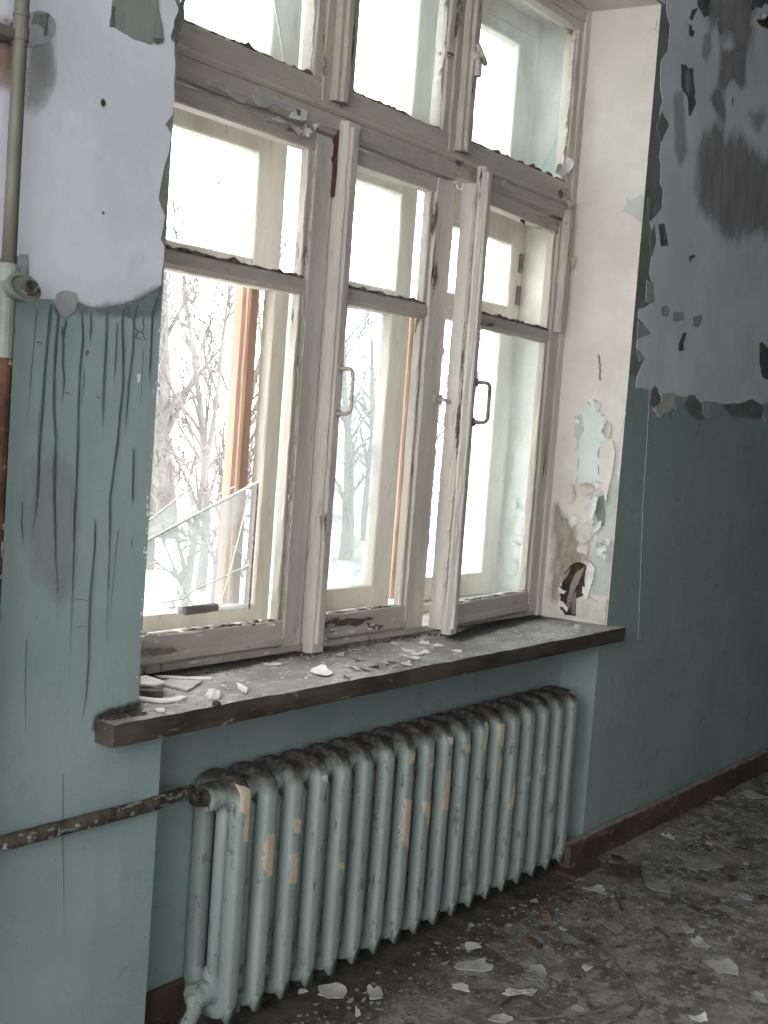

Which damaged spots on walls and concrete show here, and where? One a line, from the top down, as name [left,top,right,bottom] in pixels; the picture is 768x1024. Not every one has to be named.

spalling [27,11,56,48]
peeling [109,0,186,45]
peeling [688,0,724,37]
peeling [750,0,768,29]
peeling [681,64,696,116]
peeling [656,112,669,142]
peeling [623,194,668,257]
crack [128,315,146,340]
peeling [645,280,702,351]
peeling [759,342,768,380]
peeling [649,386,768,422]
peeling [567,397,619,625]